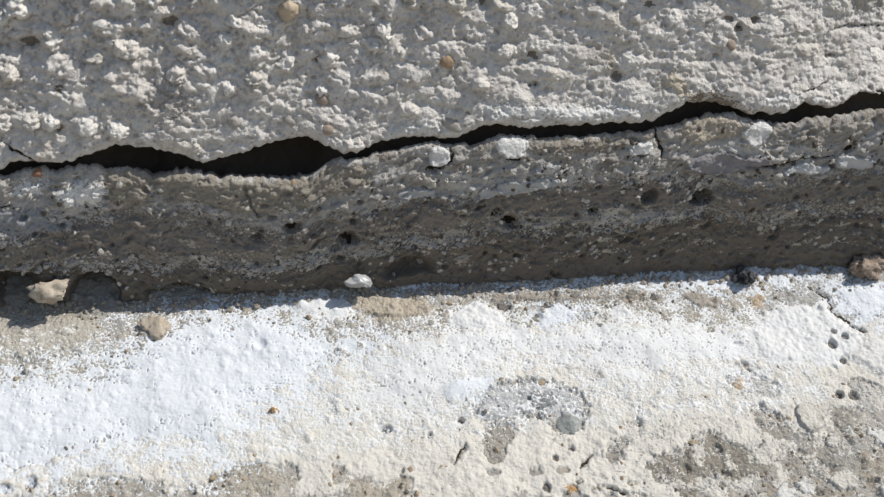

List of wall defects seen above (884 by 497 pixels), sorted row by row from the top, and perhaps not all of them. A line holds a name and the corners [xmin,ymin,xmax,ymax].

crack [0,81,884,177]
water stain [0,150,884,497]